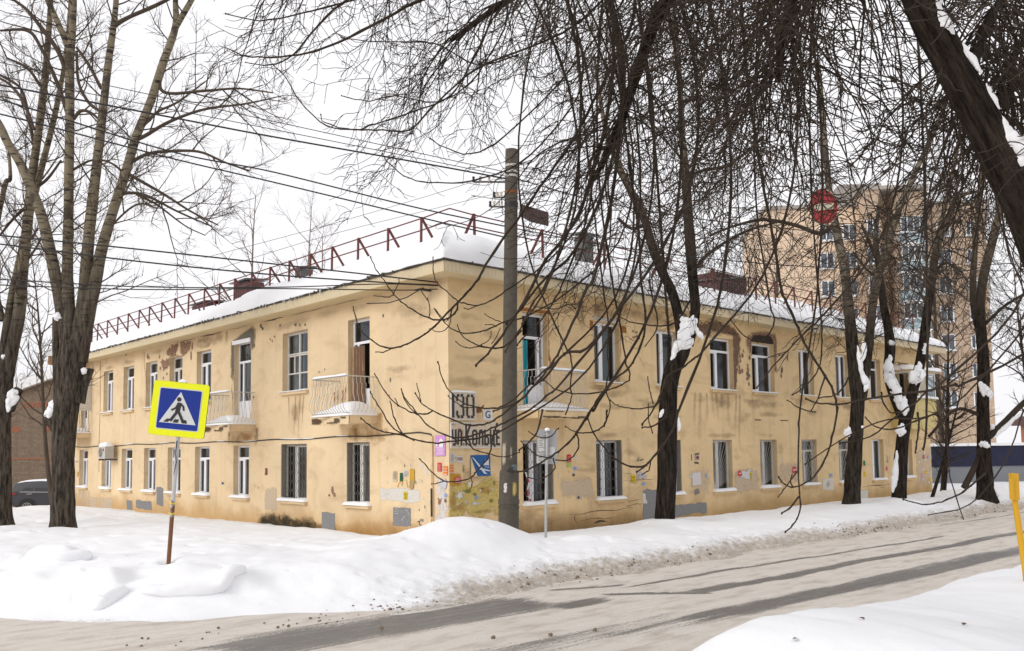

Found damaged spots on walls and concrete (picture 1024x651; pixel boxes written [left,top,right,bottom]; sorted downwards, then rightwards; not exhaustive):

peeling [147,340,193,379]